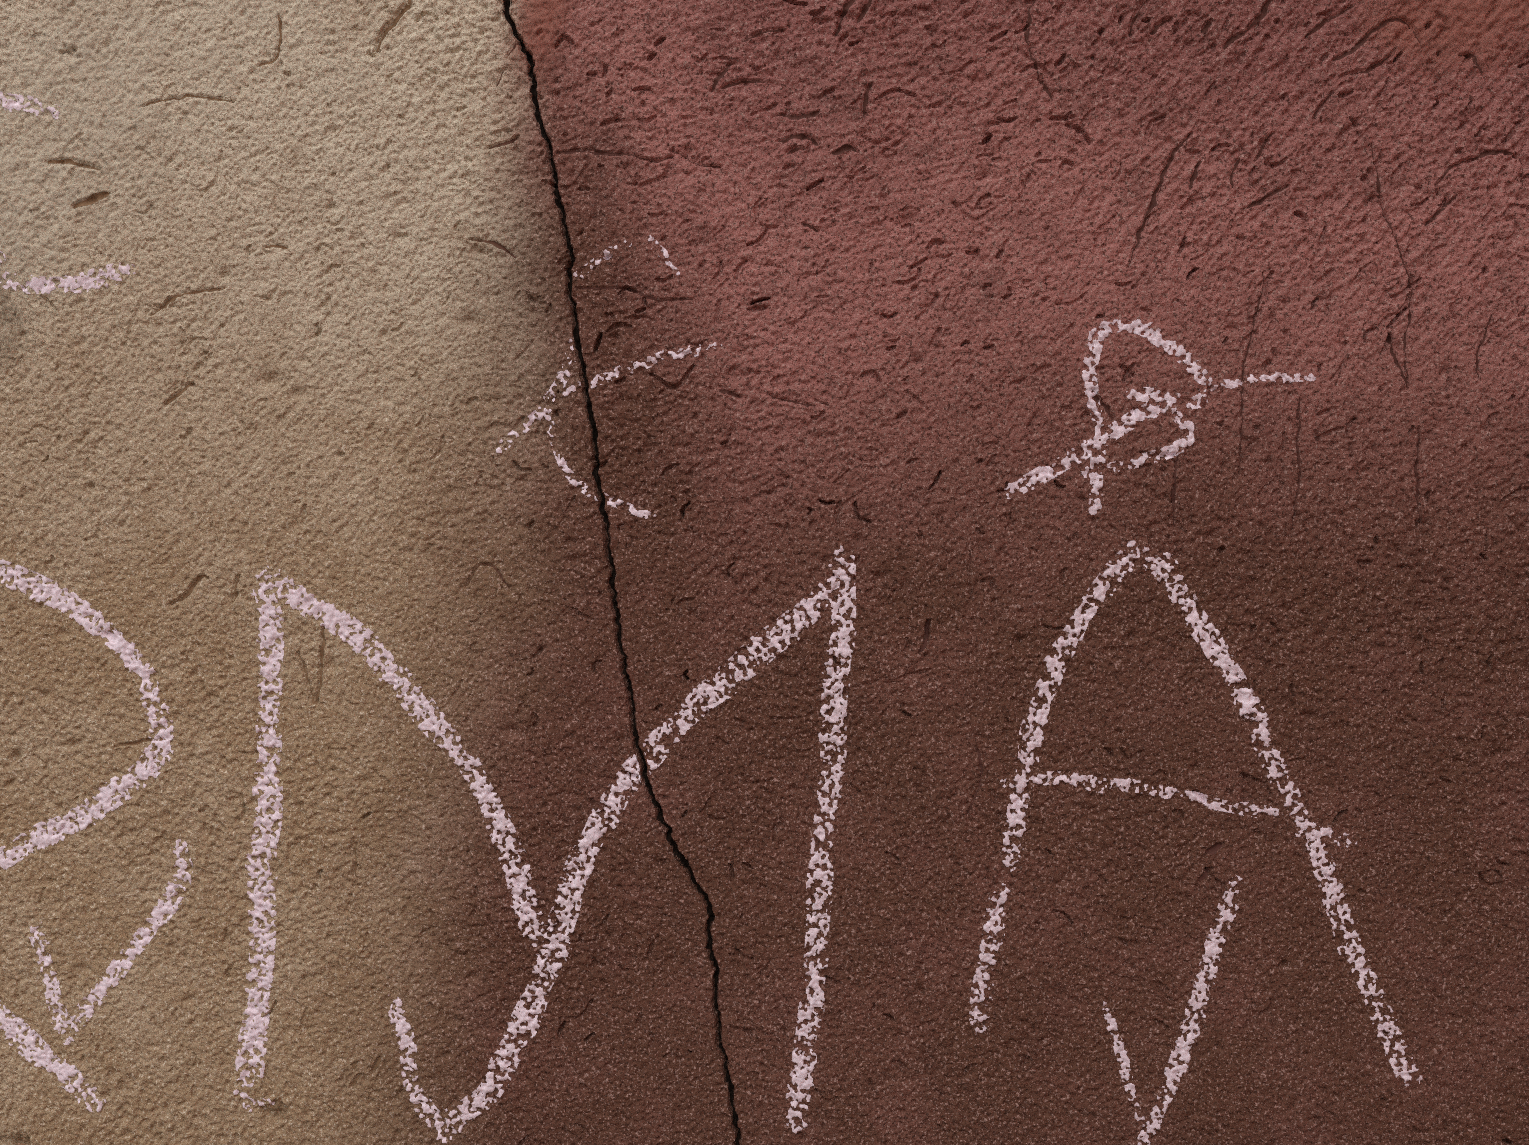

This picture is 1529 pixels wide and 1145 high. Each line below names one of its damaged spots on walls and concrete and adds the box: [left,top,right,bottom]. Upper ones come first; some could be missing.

crack [502,0,740,1145]